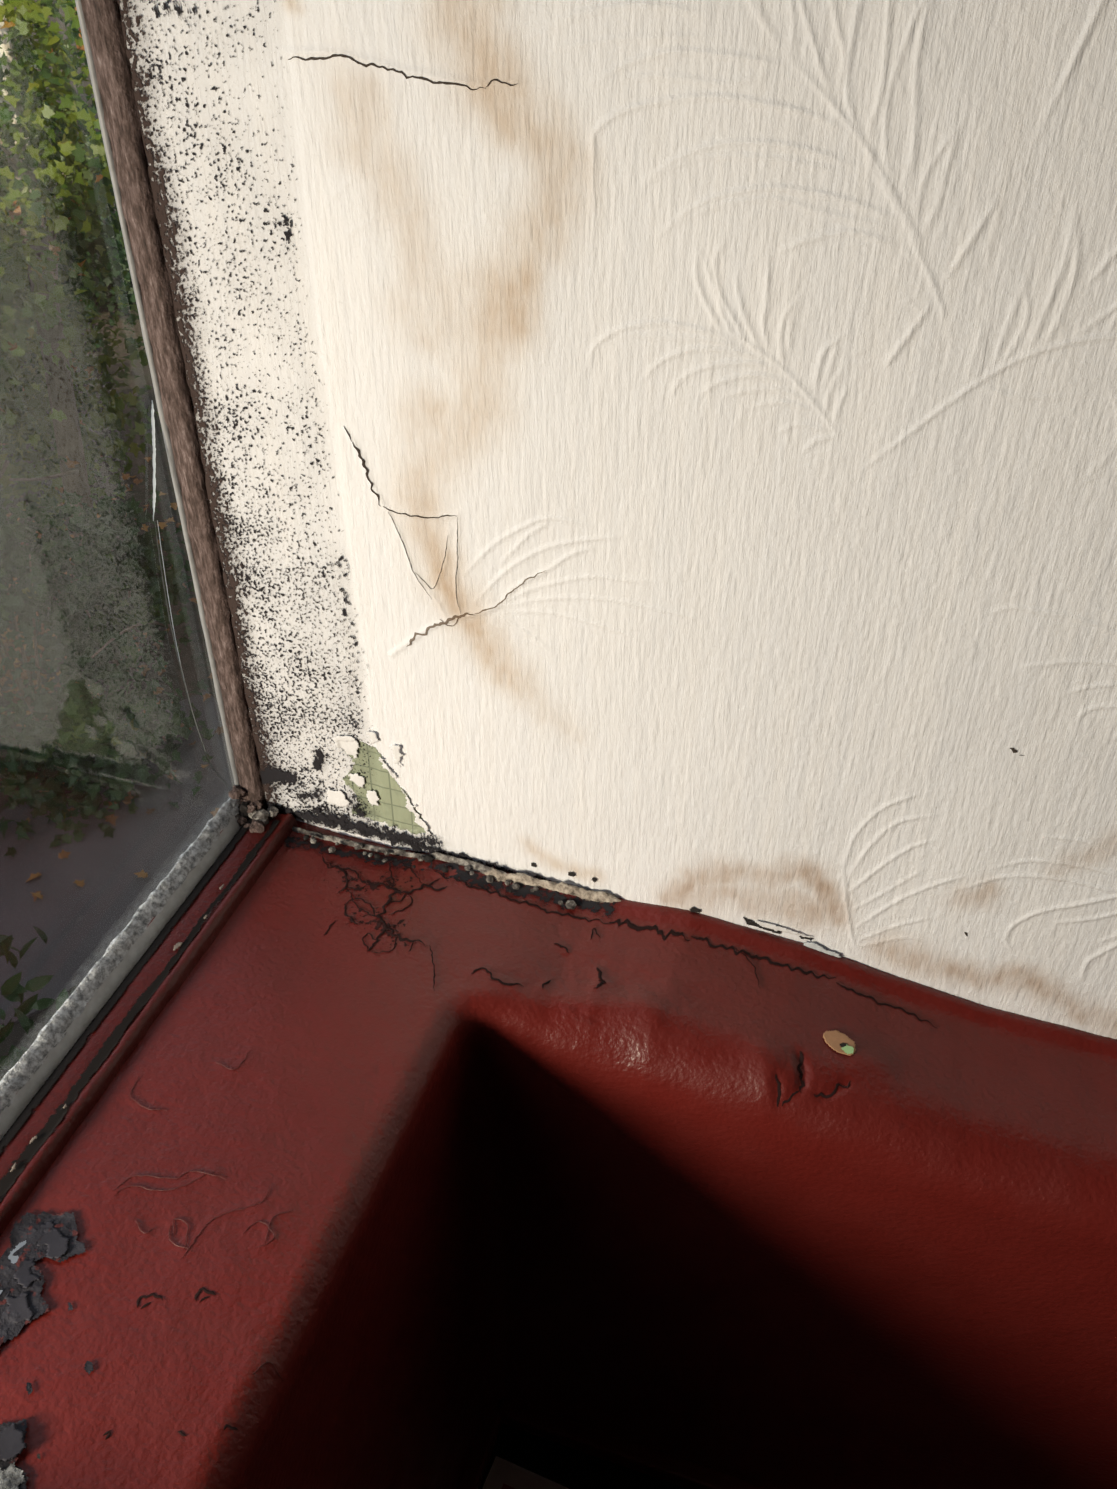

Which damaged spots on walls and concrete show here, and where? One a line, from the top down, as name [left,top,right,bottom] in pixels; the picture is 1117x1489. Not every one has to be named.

crack [288,54,516,90]
water stain [116,0,380,840]
crack [344,427,461,613]
peeling [0,735,621,1201]
crack [322,856,936,1028]
spalling [743,917,841,958]
peeling [0,1211,86,1345]
peeling [0,1419,41,1489]